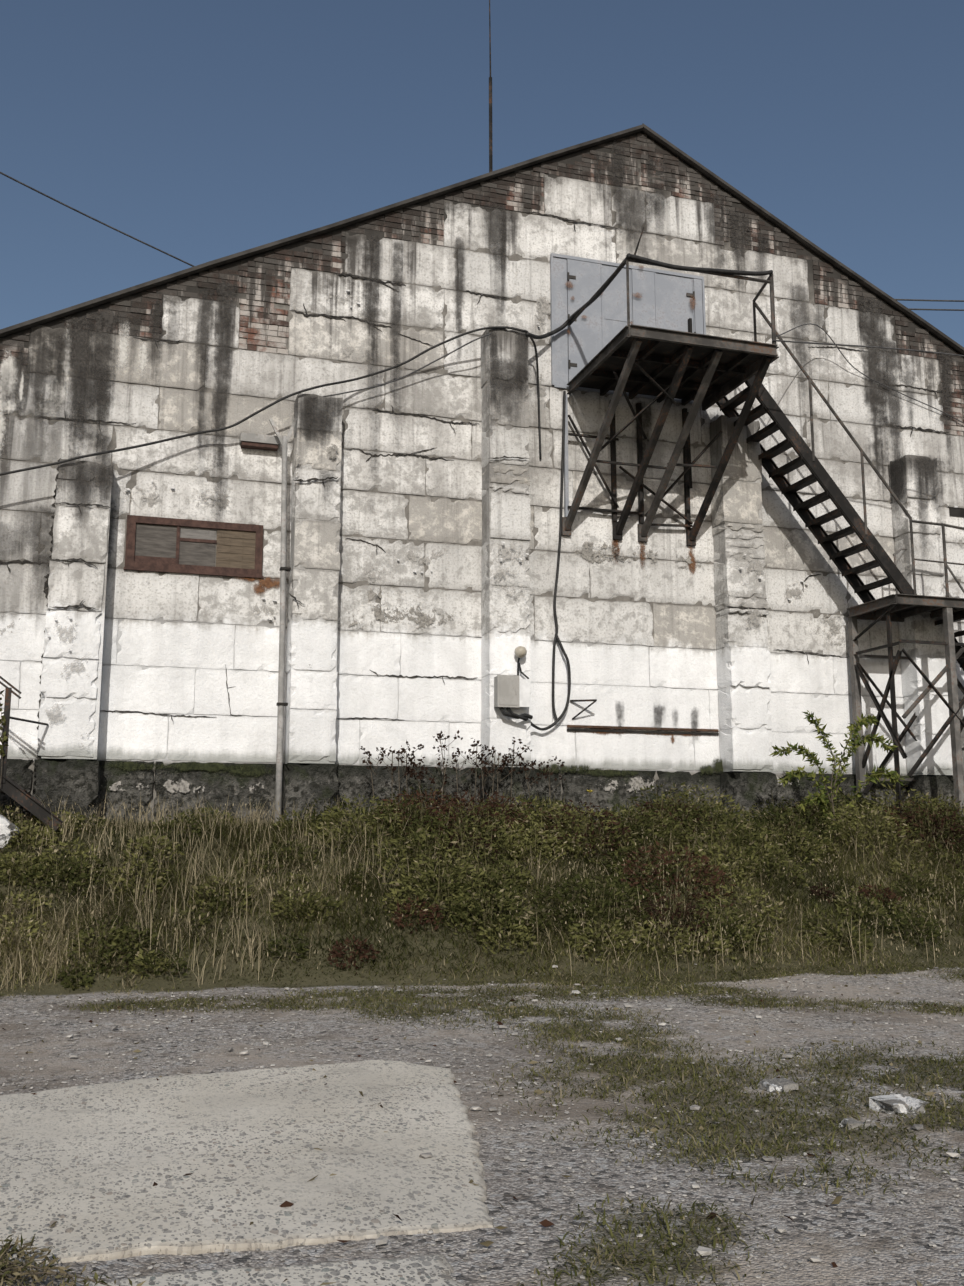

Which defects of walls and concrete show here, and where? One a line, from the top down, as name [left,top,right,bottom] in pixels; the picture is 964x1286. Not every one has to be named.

damp [484,206,512,257]
damp [15,312,121,515]
damp [149,301,163,360]
damp [197,281,237,466]
damp [299,394,340,438]
damp [365,237,403,378]
damp [455,239,464,346]
damp [490,332,529,411]
damp [859,299,953,529]
rust [242,577,280,593]